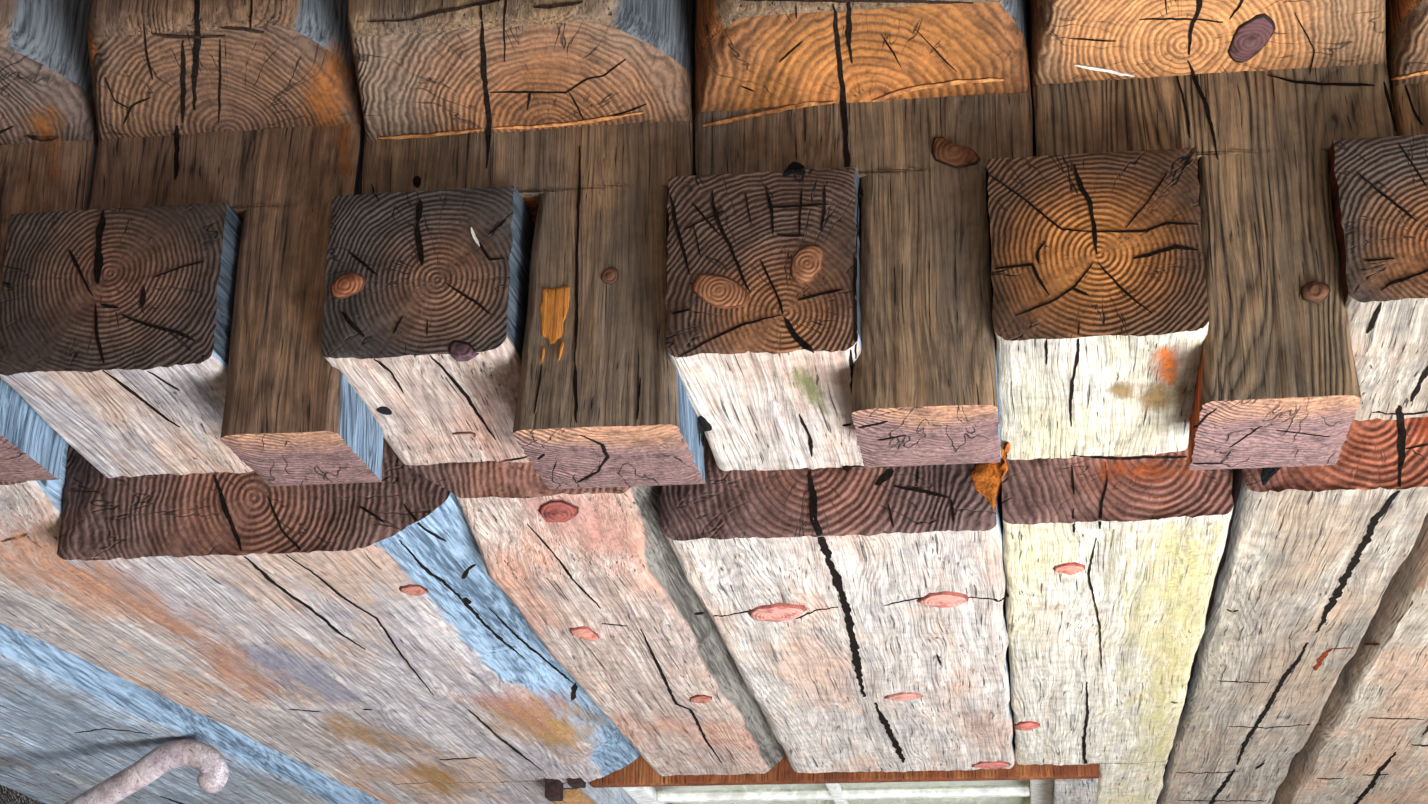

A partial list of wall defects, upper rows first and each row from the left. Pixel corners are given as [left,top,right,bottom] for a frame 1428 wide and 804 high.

crack [0,126,59,141]
crack [105,0,253,180]
crack [1267,13,1428,222]
crack [670,2,957,763]
crack [989,0,1330,764]
crack [1364,257,1428,333]
crack [213,475,434,696]
crack [969,594,1009,602]
crack [1176,365,1428,804]
crack [439,709,542,771]